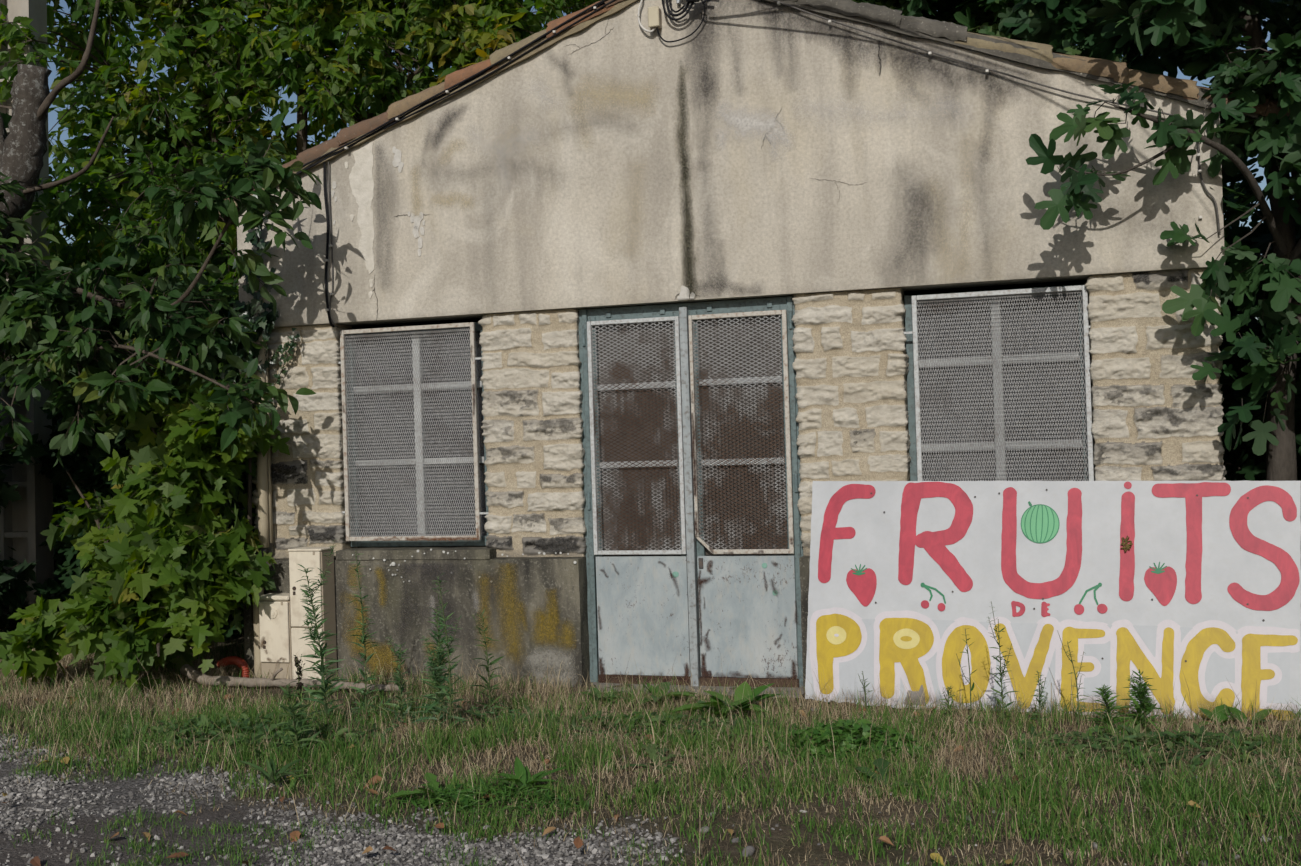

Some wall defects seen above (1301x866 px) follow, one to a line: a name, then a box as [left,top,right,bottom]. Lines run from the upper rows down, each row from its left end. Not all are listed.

peeling [331,141,375,298]
leakage [681,85,692,298]